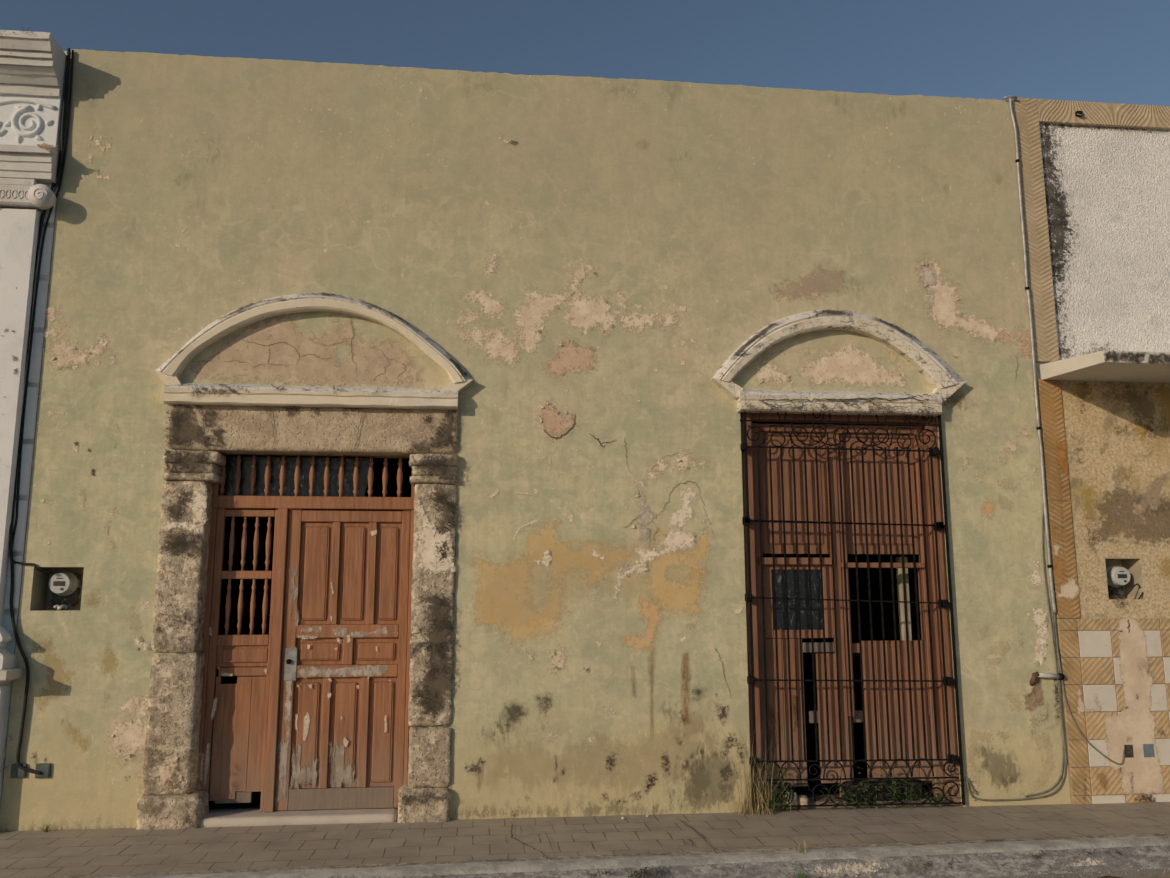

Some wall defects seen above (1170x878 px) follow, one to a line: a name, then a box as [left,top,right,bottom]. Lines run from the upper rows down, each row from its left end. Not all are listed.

damp [1040,124,1170,364]
damp [163,384,247,475]
crack [198,318,406,444]
peeling [457,251,696,392]
peeling [754,343,907,390]
peeling [916,259,1032,359]
damp [159,489,204,559]
peeling [589,448,708,603]
damp [1088,487,1170,550]
peeling [1023,555,1050,711]
peeling [1057,579,1081,599]
damp [716,694,743,781]